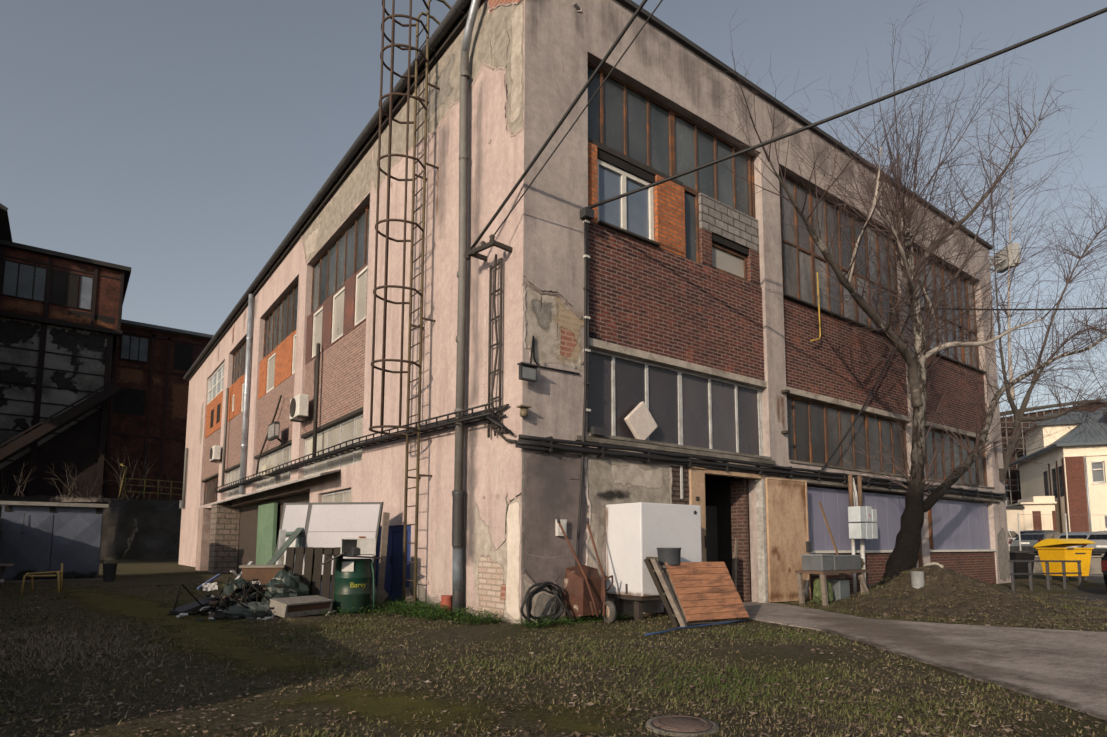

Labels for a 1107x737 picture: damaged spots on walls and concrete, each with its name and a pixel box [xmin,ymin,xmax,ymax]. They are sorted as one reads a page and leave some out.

flaking render [301,0,524,263]
flaking render [522,277,584,370]
flaking render [462,451,573,624]
flaking render [584,457,689,577]